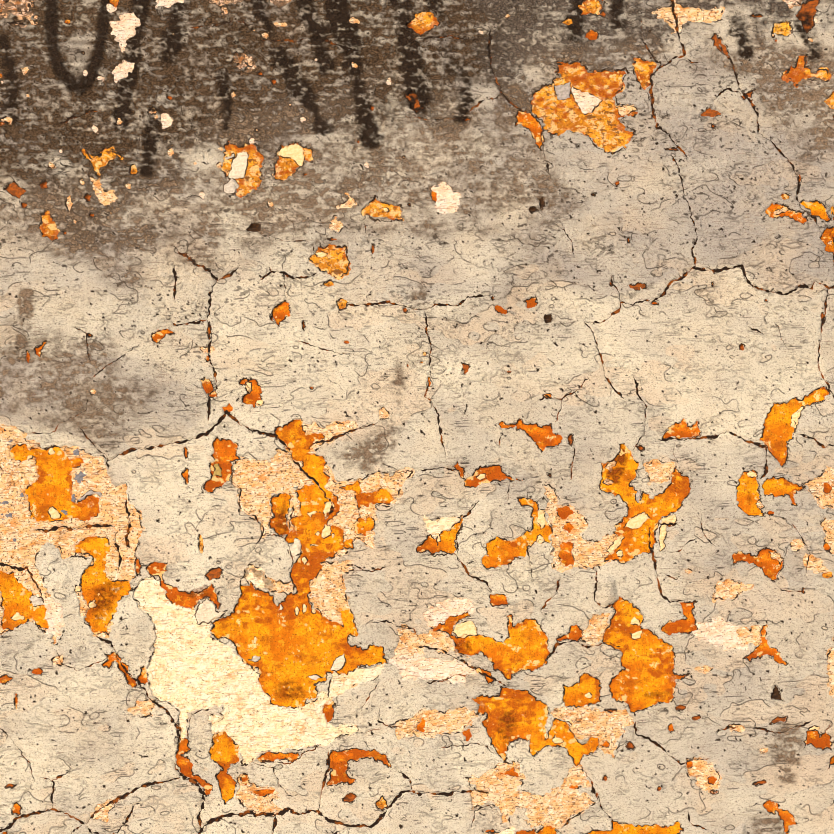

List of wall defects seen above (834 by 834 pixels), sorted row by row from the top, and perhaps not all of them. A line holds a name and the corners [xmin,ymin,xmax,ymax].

leakage [0,0,834,284]
peeling [515,56,661,155]
crack [540,0,834,479]
leakage [0,289,153,444]
crack [37,500,131,571]
crack [23,246,385,517]
peeling [58,418,413,739]
crack [348,294,490,471]
peeling [482,443,691,569]
peeling [736,386,833,517]
crack [0,636,501,834]
peeling [431,594,698,797]